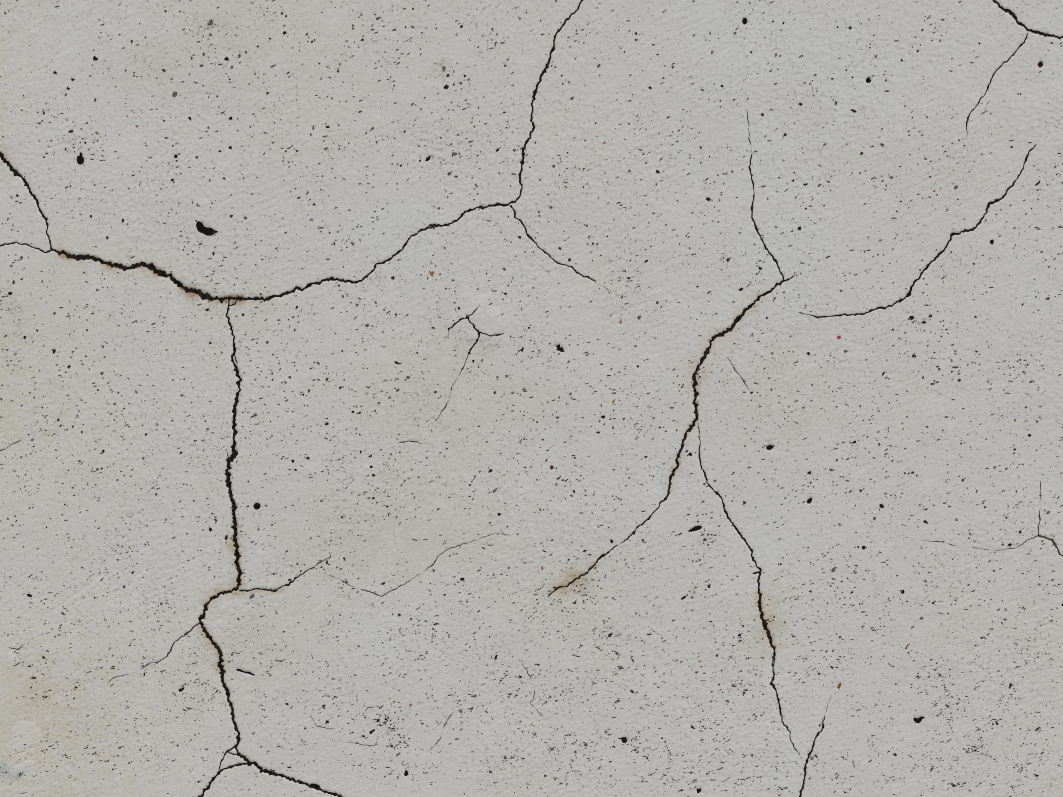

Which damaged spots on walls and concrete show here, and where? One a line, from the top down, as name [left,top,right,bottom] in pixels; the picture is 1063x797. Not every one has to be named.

crack [966,0,1063,137]
crack [800,144,1037,318]
crack [0,0,607,797]
crack [535,113,829,797]
crack [923,484,1063,556]